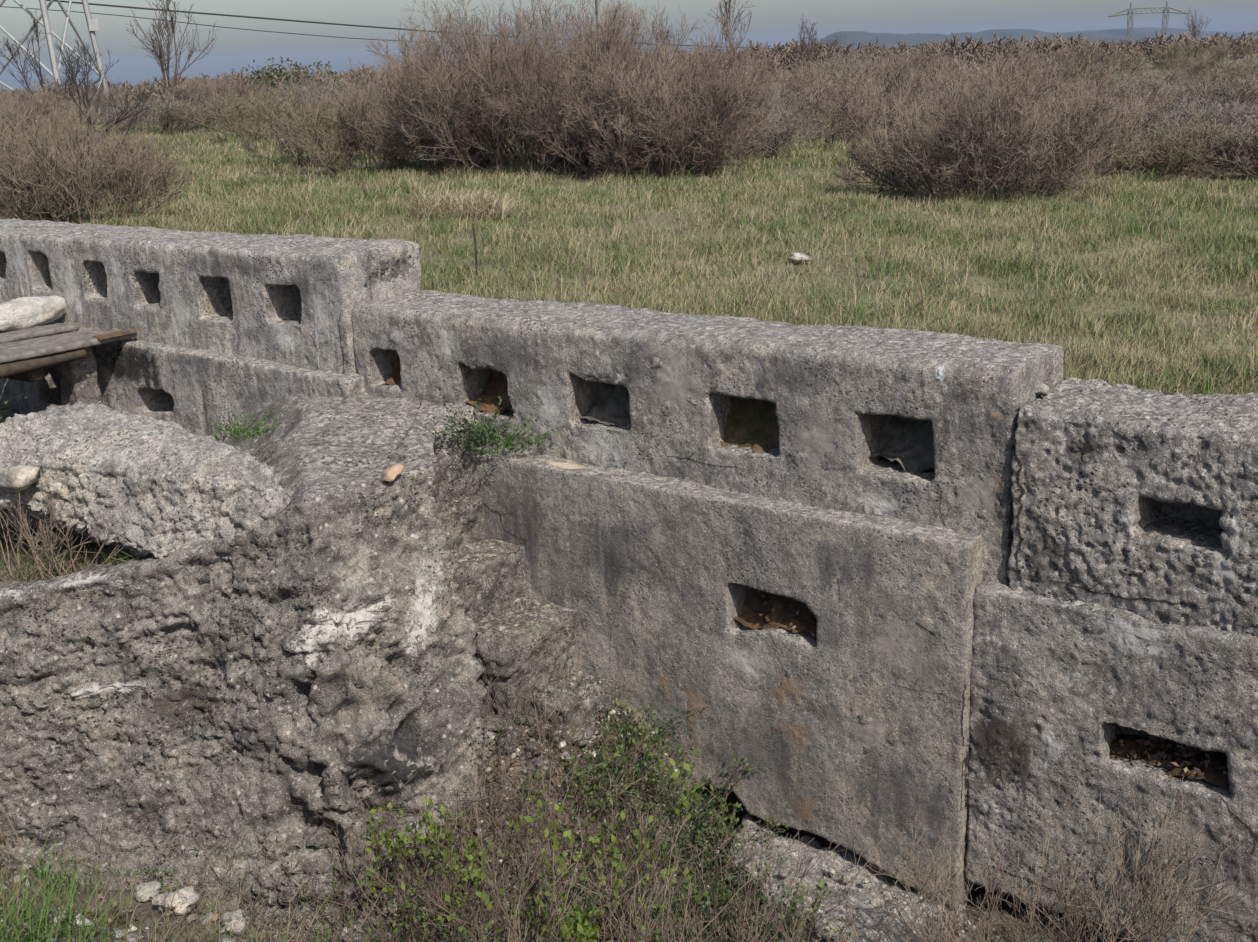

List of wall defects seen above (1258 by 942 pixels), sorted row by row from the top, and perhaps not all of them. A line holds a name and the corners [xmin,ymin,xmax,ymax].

crack [1014,407,1206,610]
peeling [337,545,371,587]
peeling [405,560,443,656]
crack [892,672,1086,901]
crack [1219,795,1258,854]